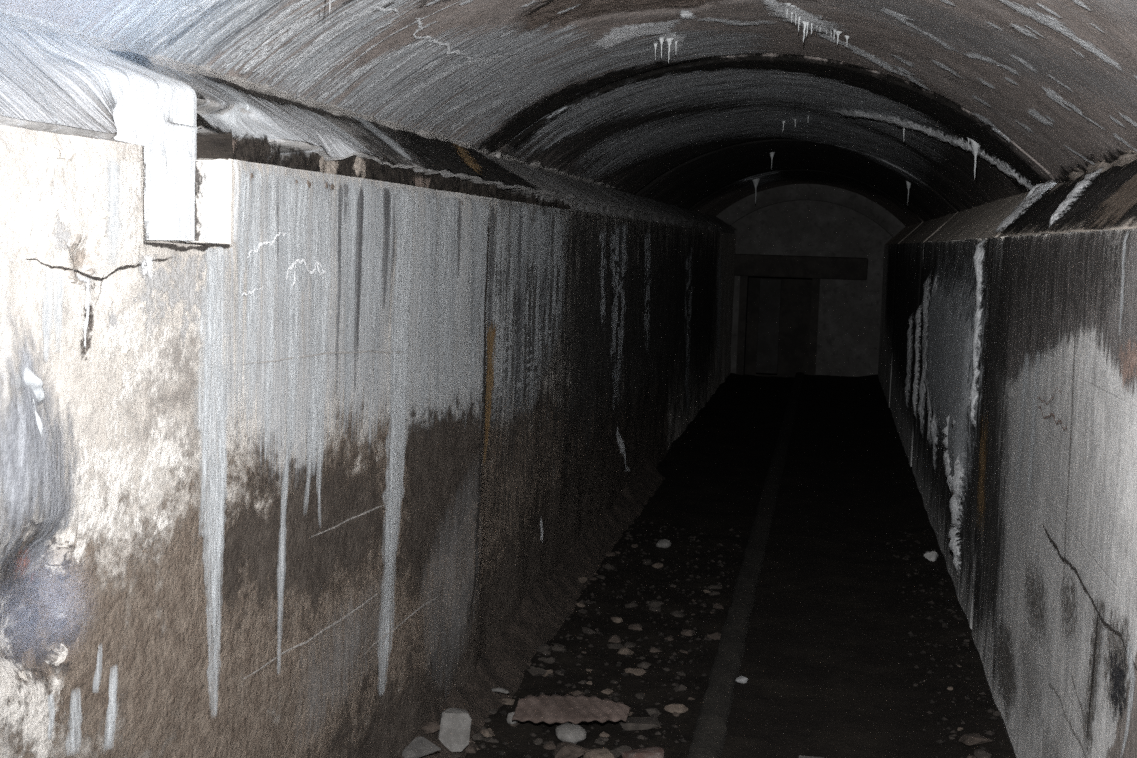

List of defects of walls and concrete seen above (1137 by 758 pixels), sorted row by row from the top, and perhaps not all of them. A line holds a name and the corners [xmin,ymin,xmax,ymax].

leakage [0,0,946,243]
leakage [970,95,1010,142]
crack [27,221,328,303]
leakage [0,161,722,758]
leakage [997,623,1017,719]
leakage [1061,576,1077,636]
crack [1037,322,1137,758]
leakage [1082,599,1137,758]